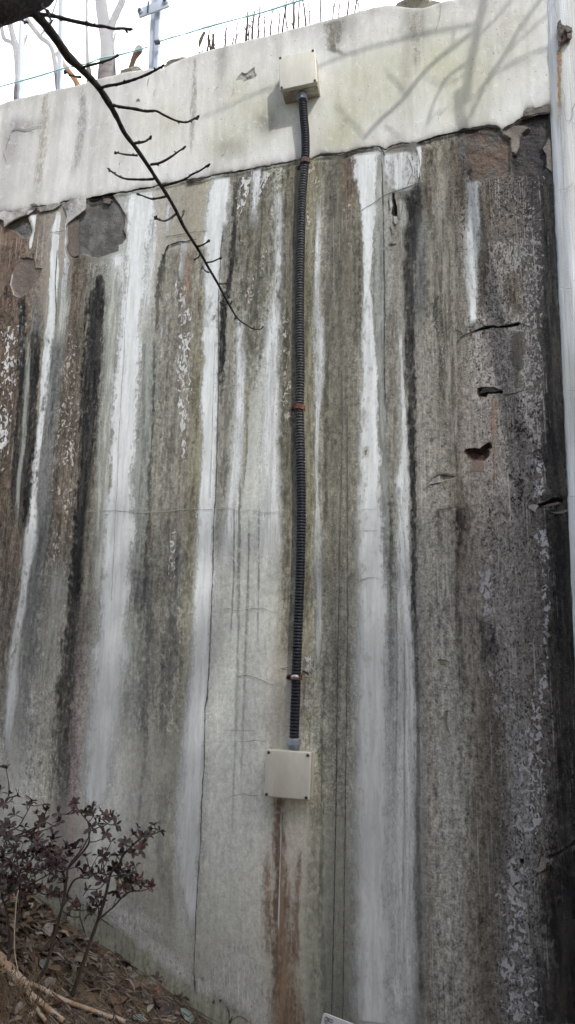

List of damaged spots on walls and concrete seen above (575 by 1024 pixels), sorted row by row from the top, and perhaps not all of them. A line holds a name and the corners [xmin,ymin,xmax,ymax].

spalling [10,258,43,298]
spalling [0,195,128,258]
crack [104,229,279,991]
damp [0,141,490,1024]
crack [40,87,575,398]
peeling [430,472,459,484]
spalling [463,104,552,181]
peeling [464,329,568,514]
damp [511,332,524,374]
damp [530,184,575,1023]
peeling [492,528,553,1022]
corrosion [264,799,304,1024]